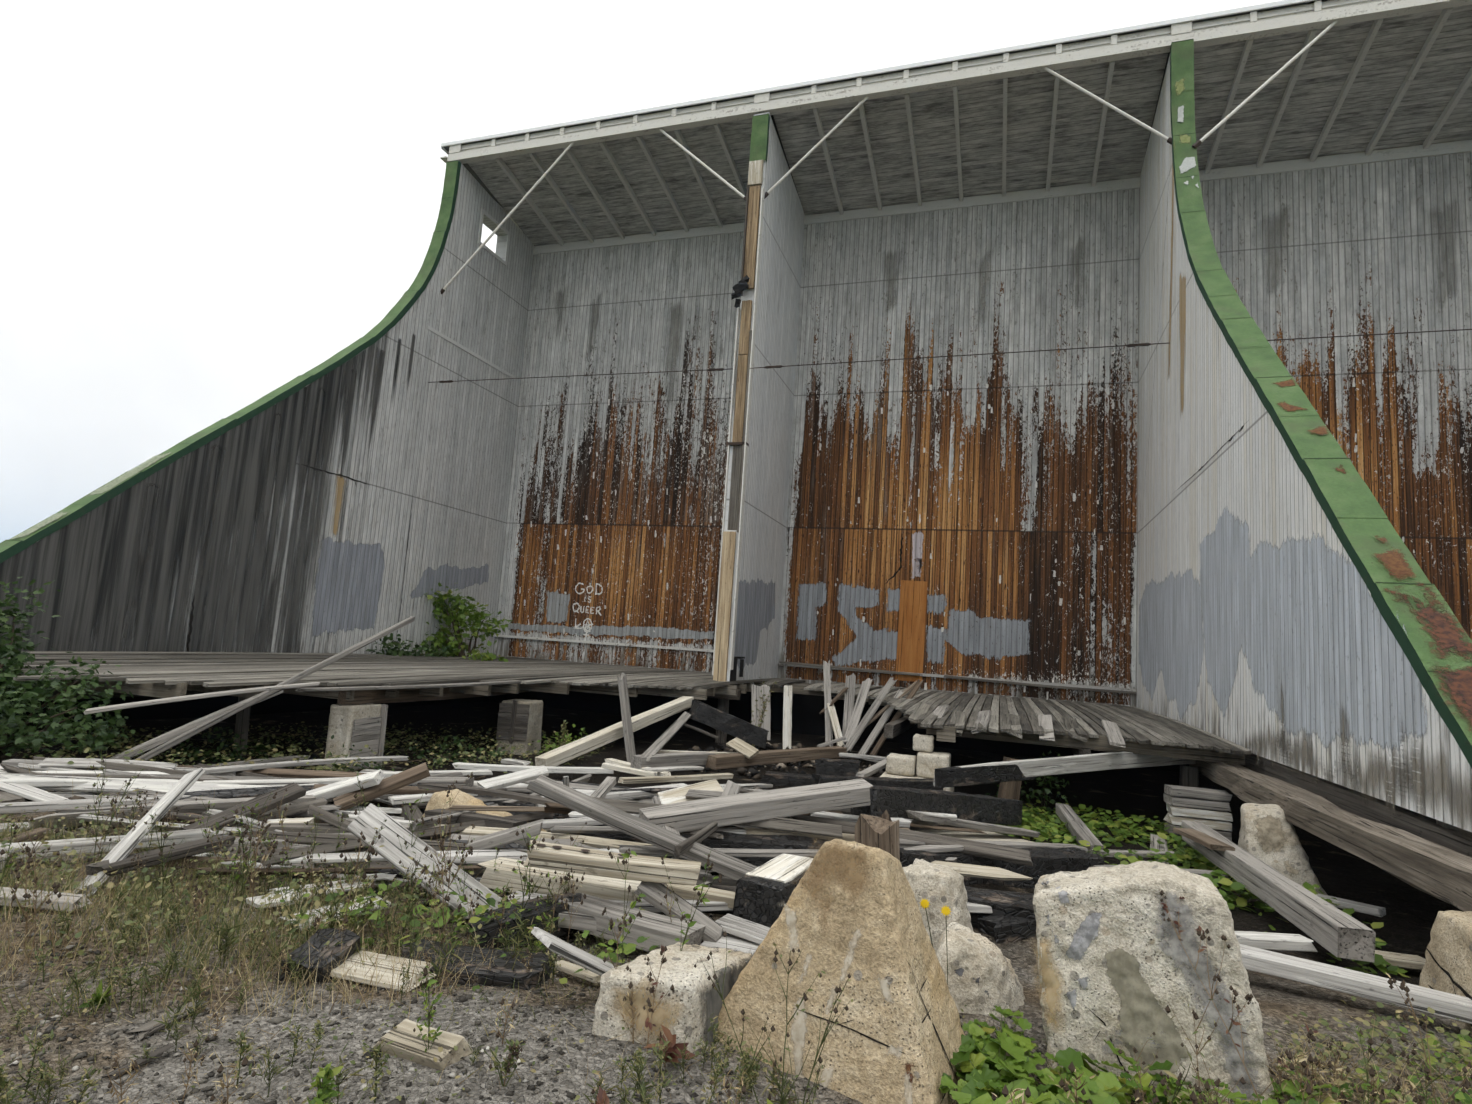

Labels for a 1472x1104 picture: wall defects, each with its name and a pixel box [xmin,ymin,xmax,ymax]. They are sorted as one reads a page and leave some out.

leakage [0,333,415,653]
corrosion [1272,378,1307,412]
corrosion [1372,535,1472,731]